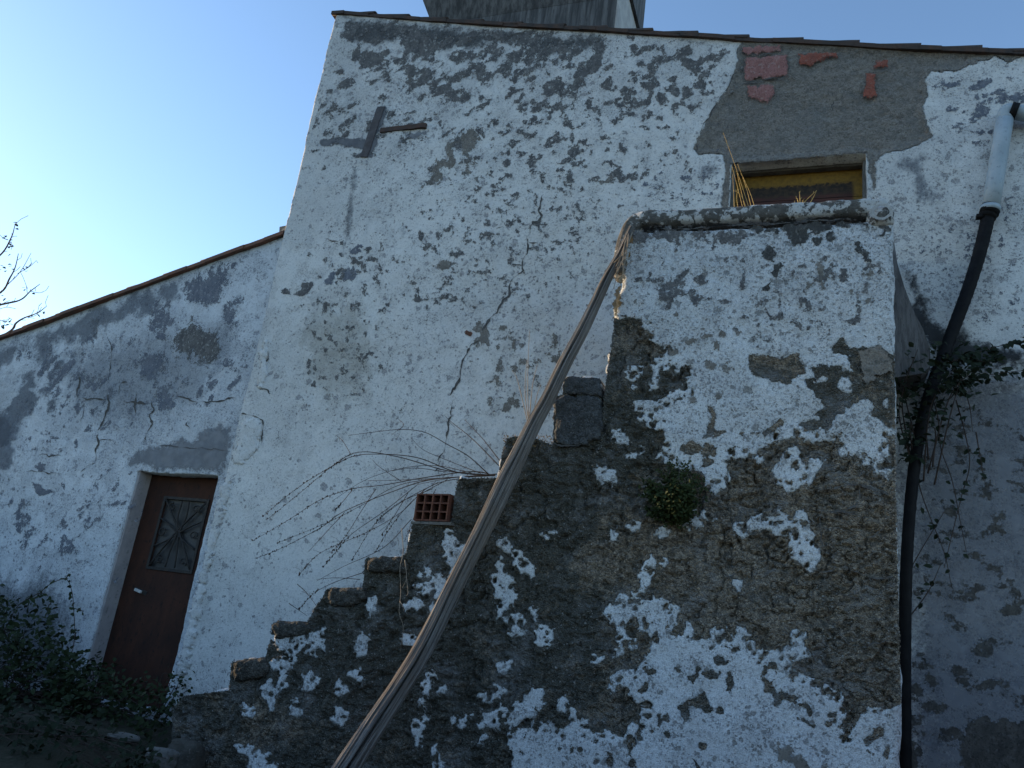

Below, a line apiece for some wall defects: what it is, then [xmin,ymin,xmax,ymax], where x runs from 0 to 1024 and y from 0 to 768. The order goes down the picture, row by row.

crack [76,337,264,473]
spalling [171,436,519,768]
crack [436,196,543,470]
spalling [281,19,1024,424]
spalling [362,216,1024,768]